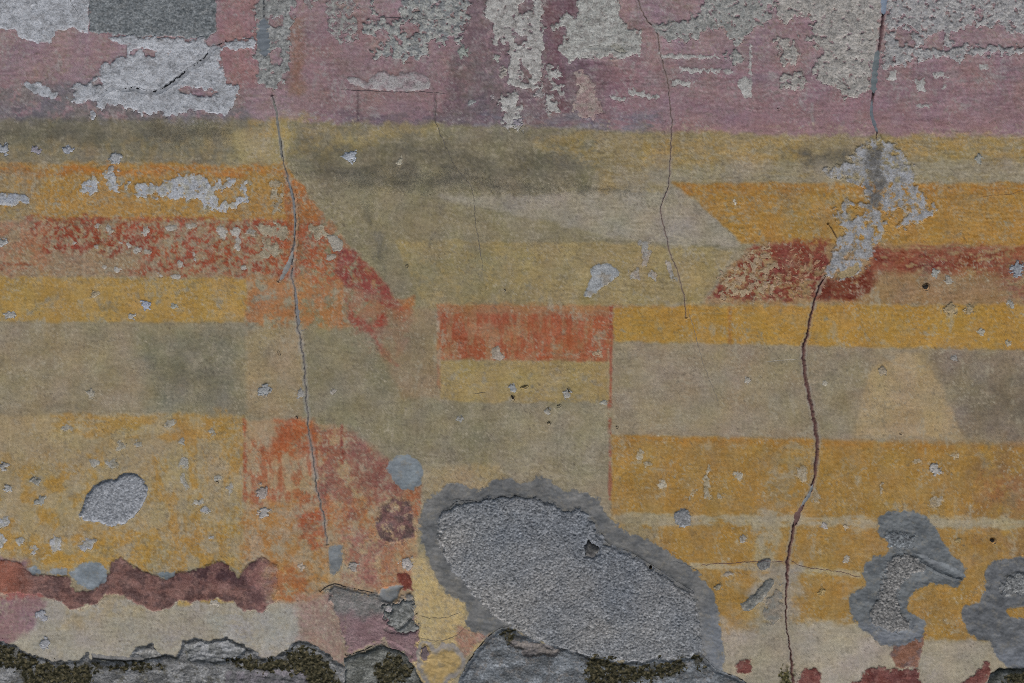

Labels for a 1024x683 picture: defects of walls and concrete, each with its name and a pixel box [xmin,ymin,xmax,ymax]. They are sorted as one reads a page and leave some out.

peeling [0,0,1024,133]
crack [867,0,888,140]
peeling [79,152,289,259]
crack [269,96,331,545]
peeling [306,223,343,261]
peeling [583,239,678,298]
crack [635,0,718,401]
spalling [715,134,938,303]
spalling [78,439,148,527]
peeling [674,464,725,528]
flaking render [0,584,422,683]
flaking render [459,628,745,683]